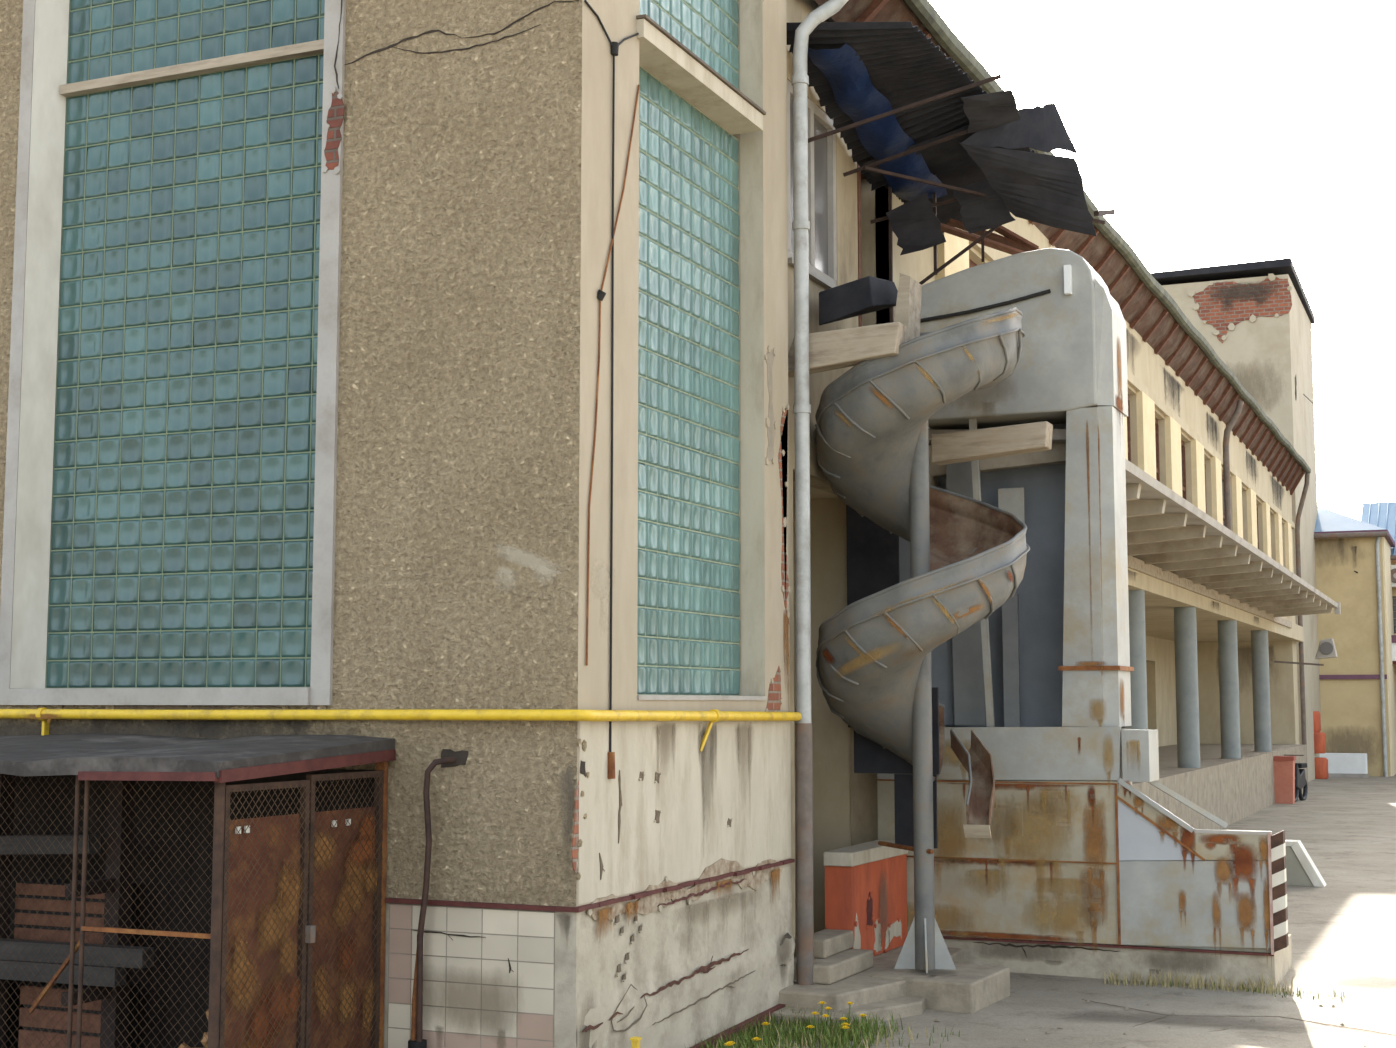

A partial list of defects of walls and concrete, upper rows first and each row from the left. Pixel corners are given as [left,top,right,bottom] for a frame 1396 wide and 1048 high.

crack [334,0,579,89]
spalling [321,85,345,175]
spalling [1188,273,1292,344]
rust [1086,425,1101,557]
leakage [699,725,717,765]
rust [1093,702,1103,725]
spalling [571,739,590,880]
rust [1123,782,1143,813]
spalling [587,858,779,982]
rust [934,784,1105,945]
rust [1158,816,1272,957]